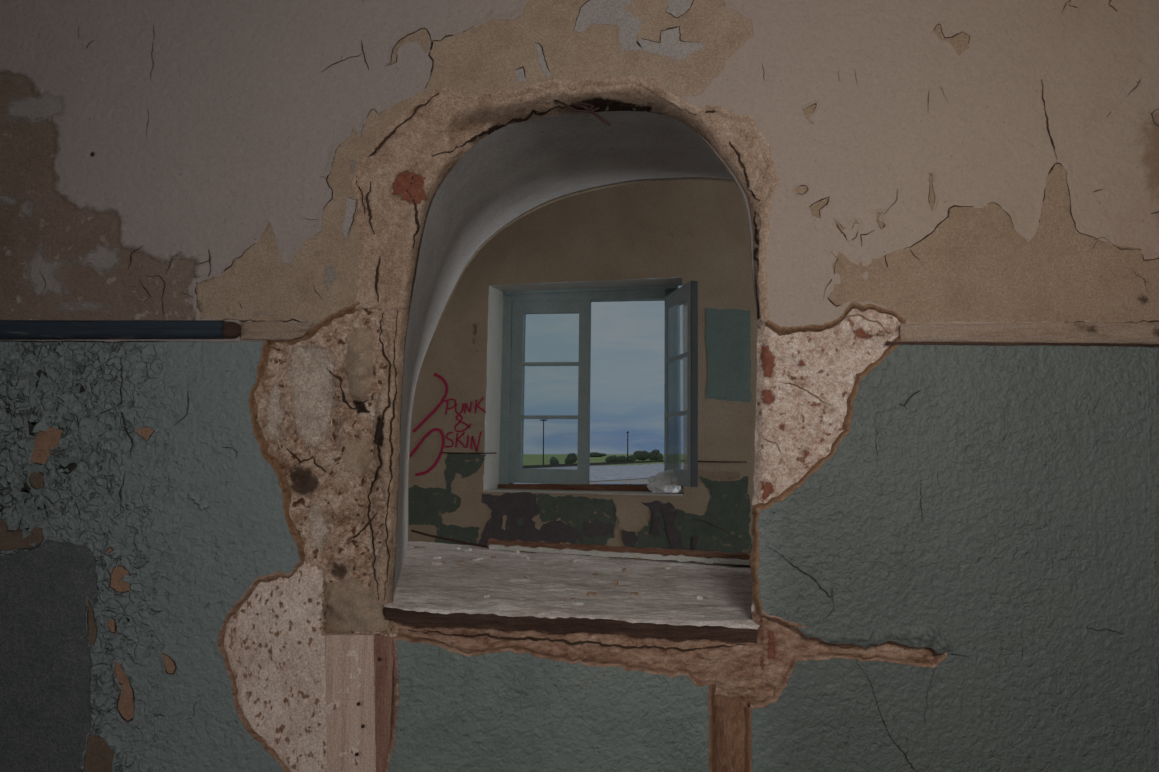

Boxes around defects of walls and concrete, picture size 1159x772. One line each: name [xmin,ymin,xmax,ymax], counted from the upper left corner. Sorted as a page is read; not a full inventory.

crack [322,41,369,72]
crack [1041,79,1057,158]
crack [823,189,921,300]
crack [1089,237,1151,297]
peeling [352,0,1159,709]
flaking render [0,71,756,772]